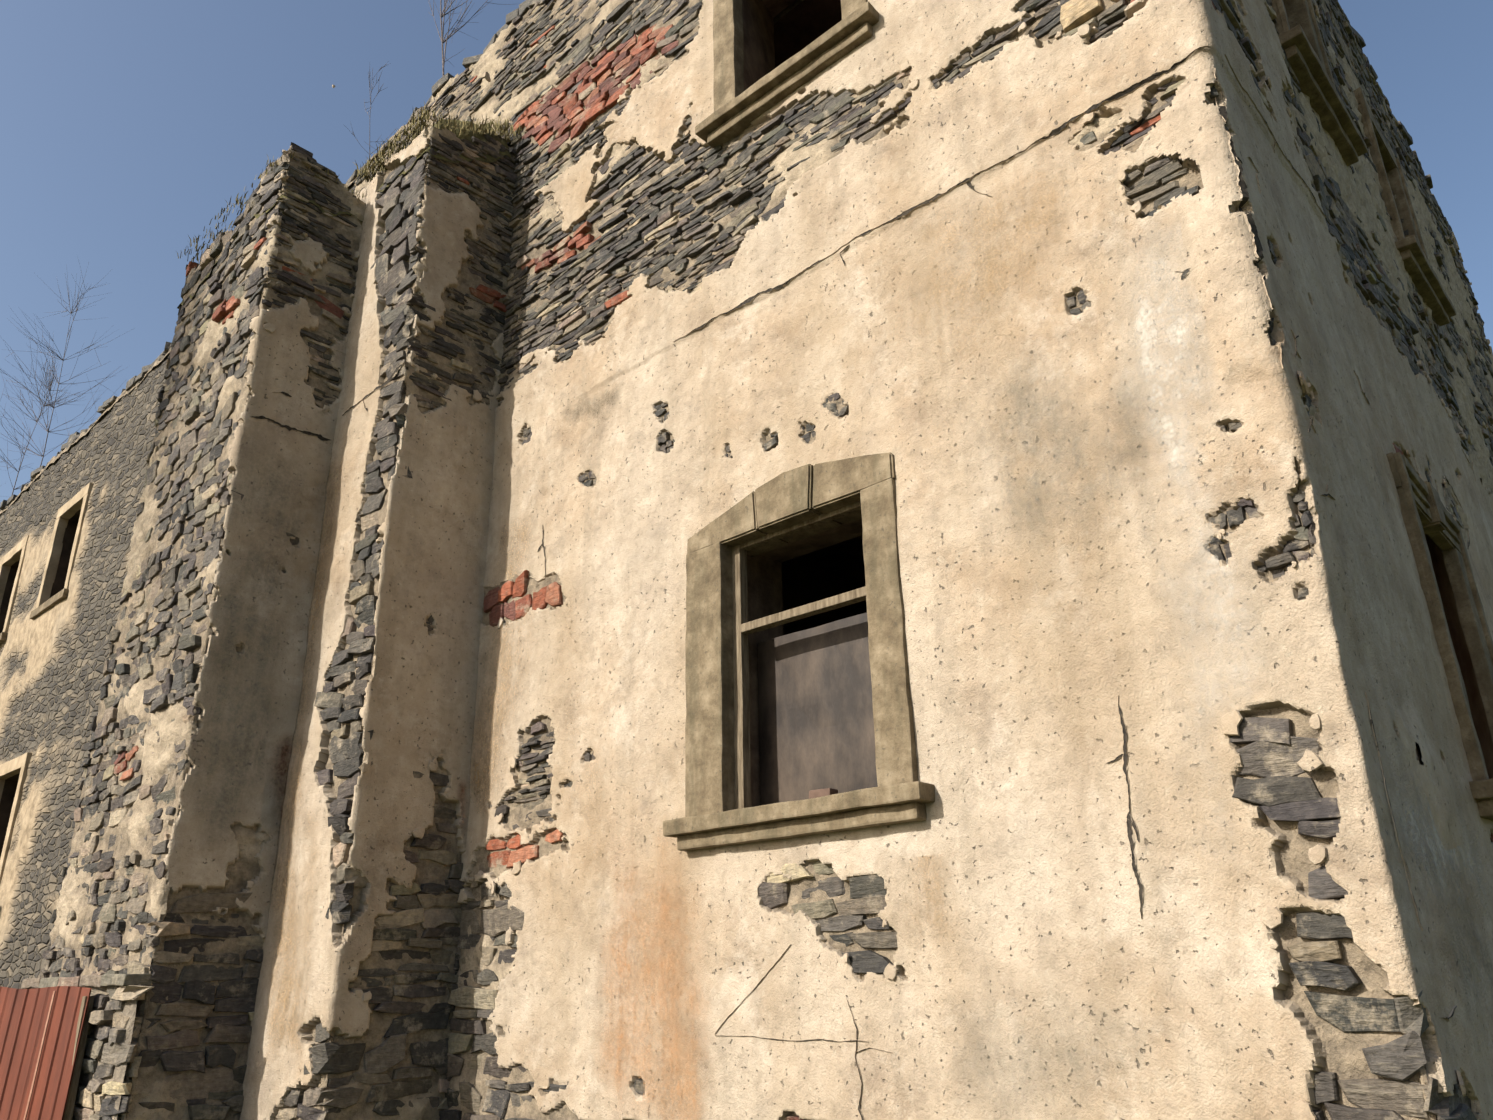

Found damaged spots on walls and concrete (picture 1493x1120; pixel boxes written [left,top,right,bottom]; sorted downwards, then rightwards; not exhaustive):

crack [674,46,1326,369]
spalling [1069,79,1204,219]
spalling [1211,0,1493,542]
spalling [40,0,1135,1120]
spalling [1207,499,1263,561]
spalling [1257,490,1317,583]
spalling [1297,588,1309,600]
crack [1108,695,1144,919]
spalling [1221,707,1477,1120]